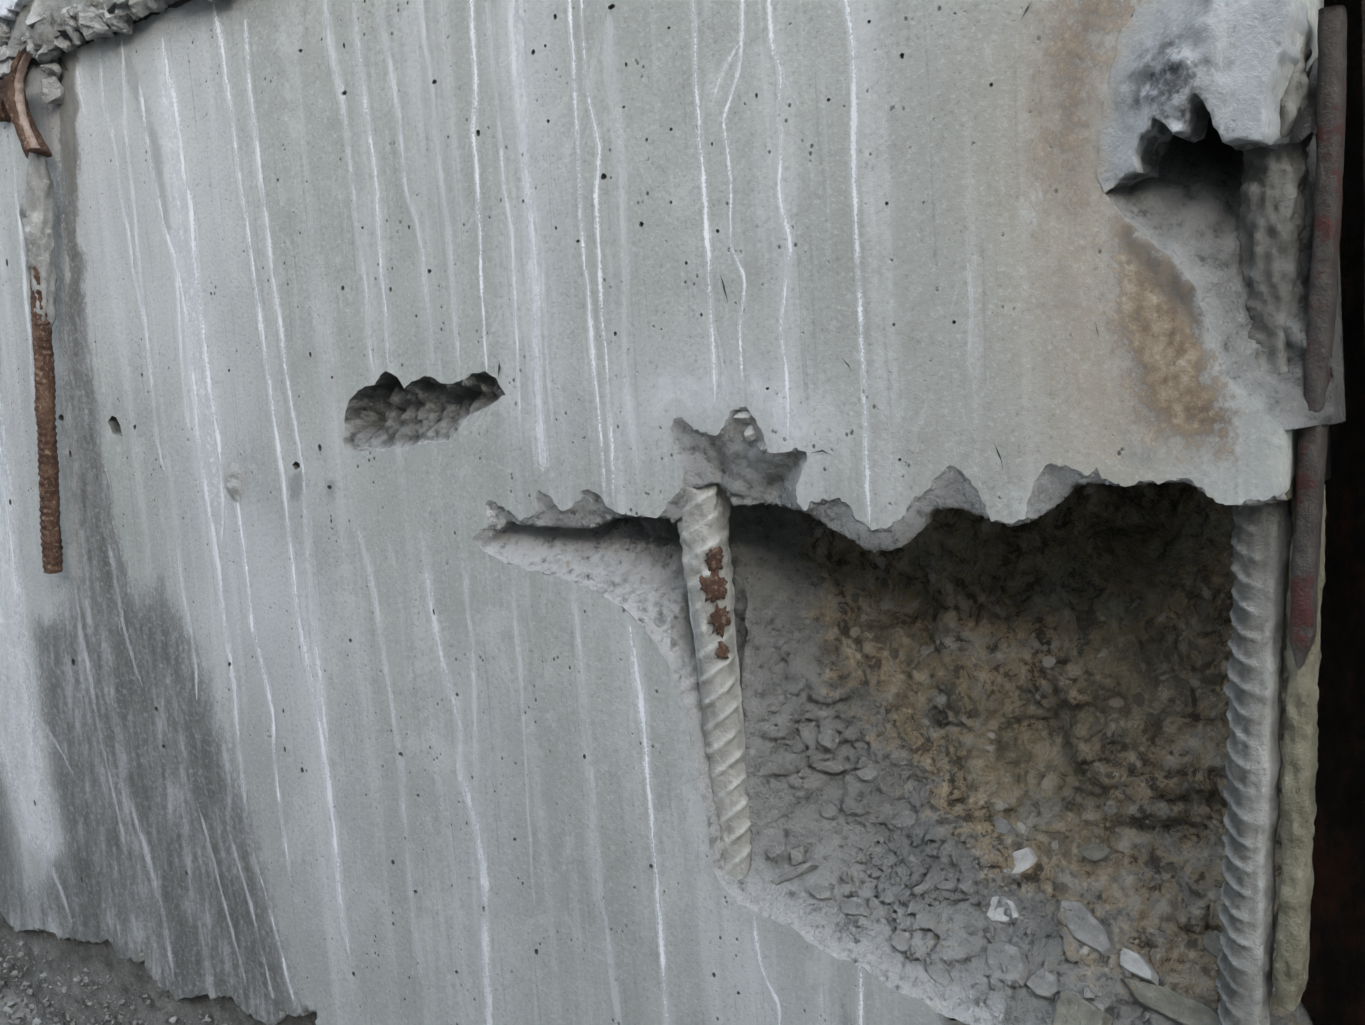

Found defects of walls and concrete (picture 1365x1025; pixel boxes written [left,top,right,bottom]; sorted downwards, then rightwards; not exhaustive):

water stain [0,38,301,1025]
water stain [213,3,350,956]
spalling [343,371,506,451]
water stain [469,0,493,371]
water stain [568,0,615,501]
water stain [692,2,716,400]
rust [699,546,731,660]
water stain [843,0,871,523]
spalling [472,58,1346,1025]
rust [1027,0,1140,217]
rust [1095,210,1239,463]
water stain [629,627,668,1017]